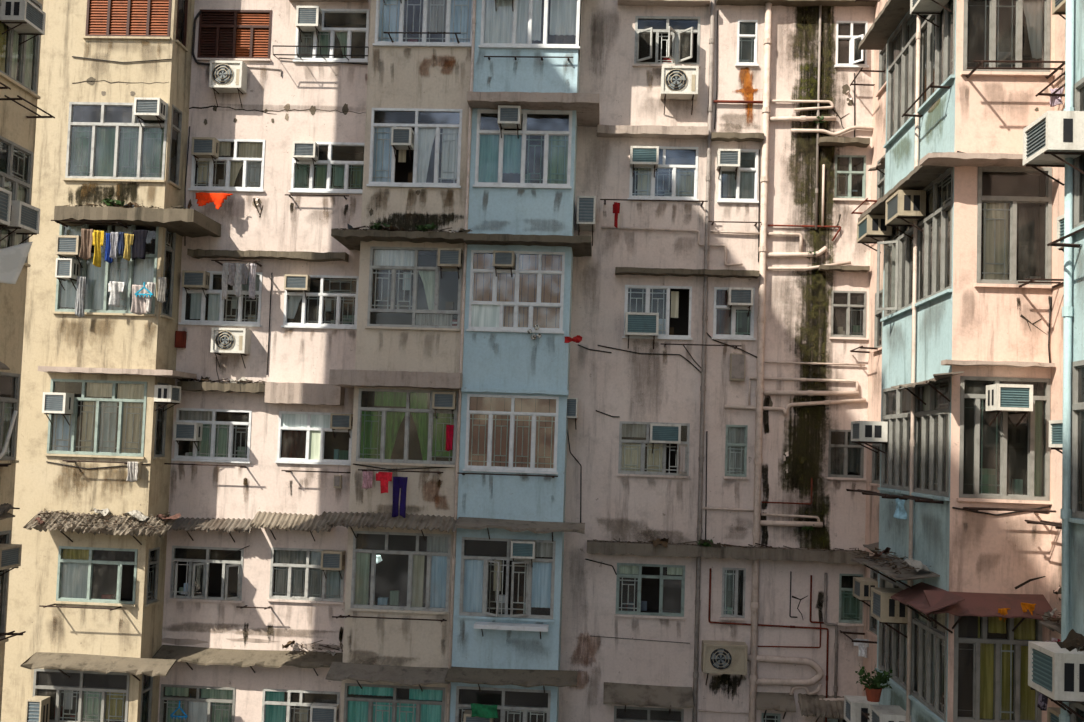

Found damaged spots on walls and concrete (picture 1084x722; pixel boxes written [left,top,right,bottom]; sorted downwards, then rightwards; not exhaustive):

corrosion [735,67,758,119]
water stain [370,212,462,231]
water stain [760,6,839,549]